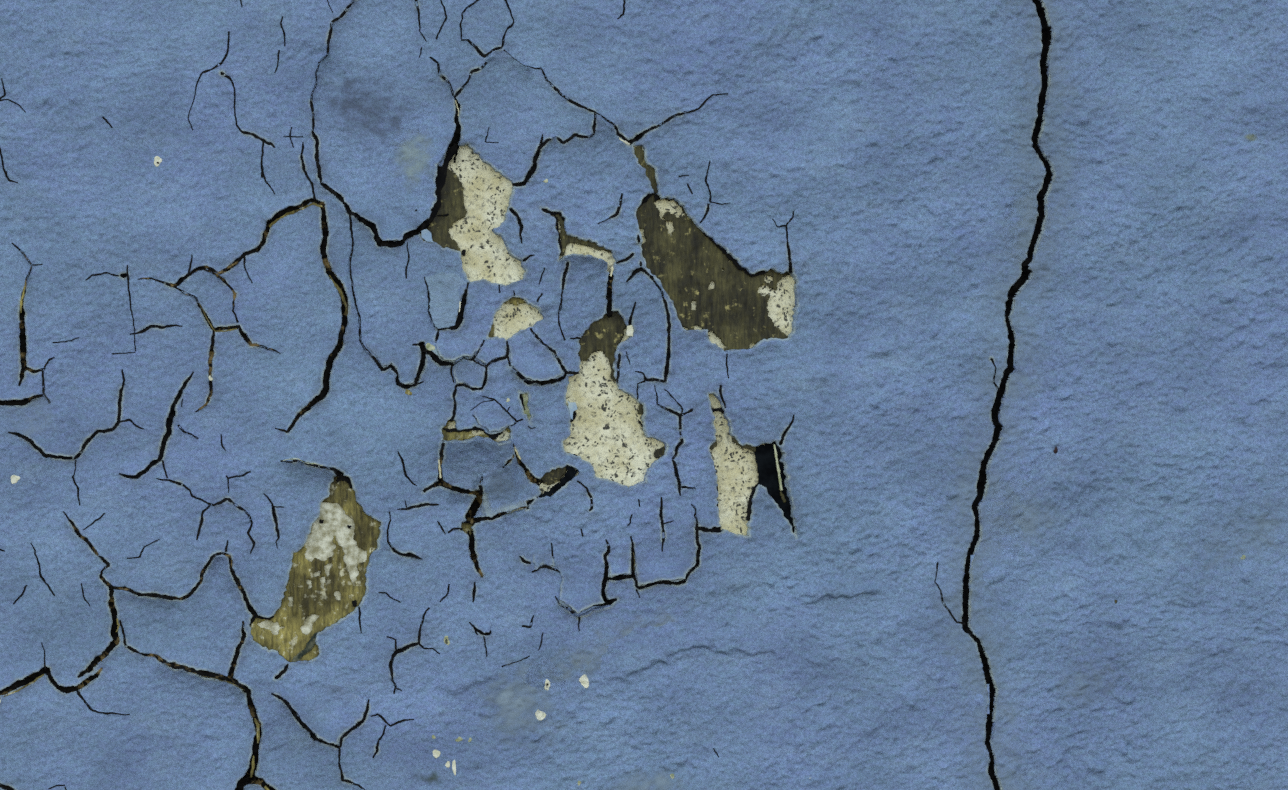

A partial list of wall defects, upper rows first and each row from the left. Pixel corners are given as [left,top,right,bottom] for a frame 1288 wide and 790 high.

peeling [418,144,543,340]
peeling [634,146,796,351]
crack [772,211,794,273]
crack [0,0,729,790]
peeling [526,311,665,509]
peeling [709,394,795,536]
crack [779,414,795,444]
crack [935,0,1055,790]
peeling [249,474,381,662]